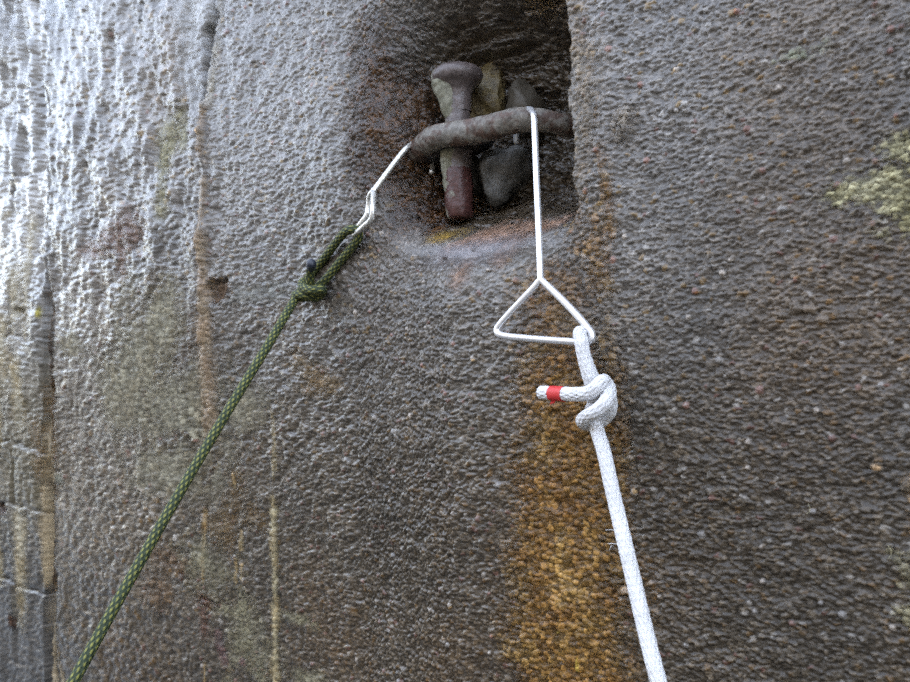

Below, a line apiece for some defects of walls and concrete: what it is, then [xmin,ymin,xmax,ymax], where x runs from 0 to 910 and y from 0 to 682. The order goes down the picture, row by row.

damp [160,0,223,177]
rust [540,298,583,387]
damp [15,512,24,596]
damp [40,424,56,583]
rust [512,399,618,682]
damp [52,621,65,682]